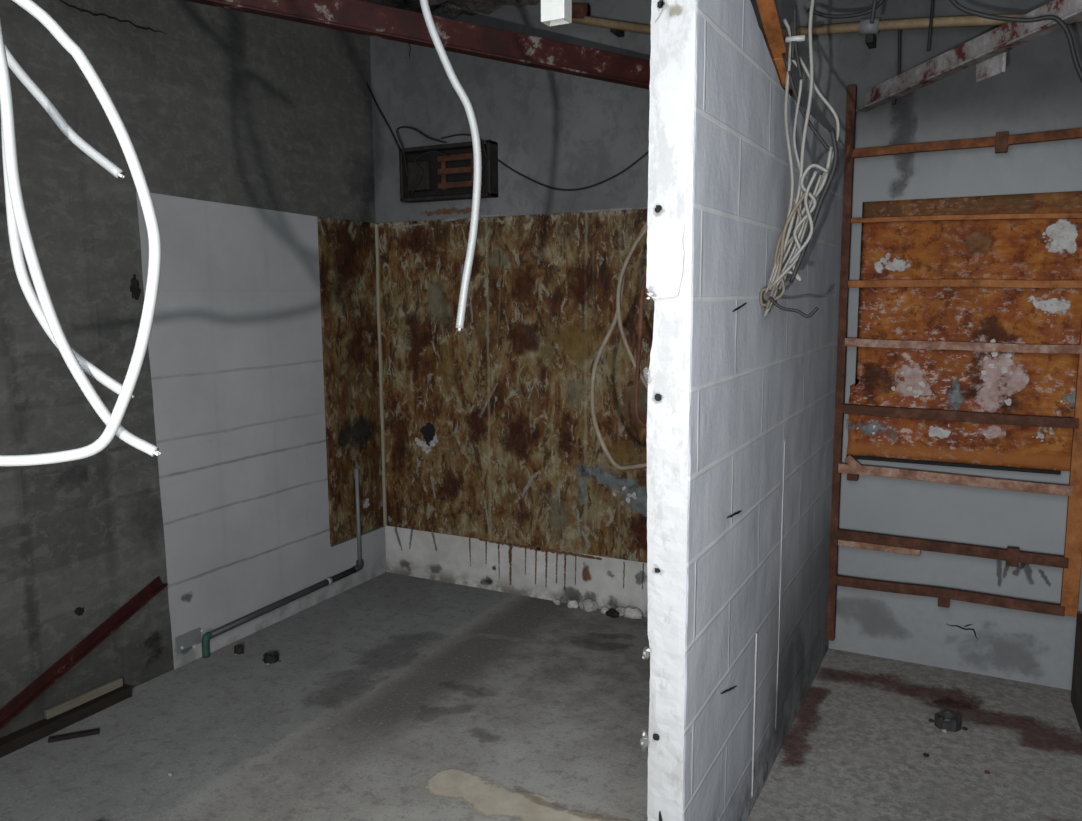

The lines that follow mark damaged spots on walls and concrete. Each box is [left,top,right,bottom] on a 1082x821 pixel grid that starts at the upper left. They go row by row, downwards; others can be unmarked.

rust [427,208,472,216]
rust [470,247,481,279]
rust [409,314,427,368]
rust [511,323,540,354]
rust [948,320,1016,397]
rust [861,363,895,397]
rust [997,379,1019,413]
rust [629,518,647,549]
rust [469,538,602,588]